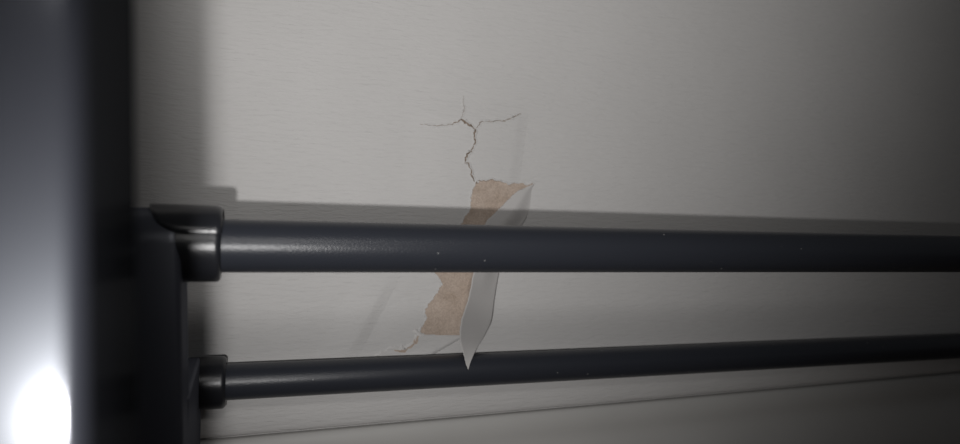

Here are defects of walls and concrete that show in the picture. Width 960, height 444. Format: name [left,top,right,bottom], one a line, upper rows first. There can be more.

crack [420,96,521,183]
peeling [459,177,535,226]
peeling [374,272,500,369]